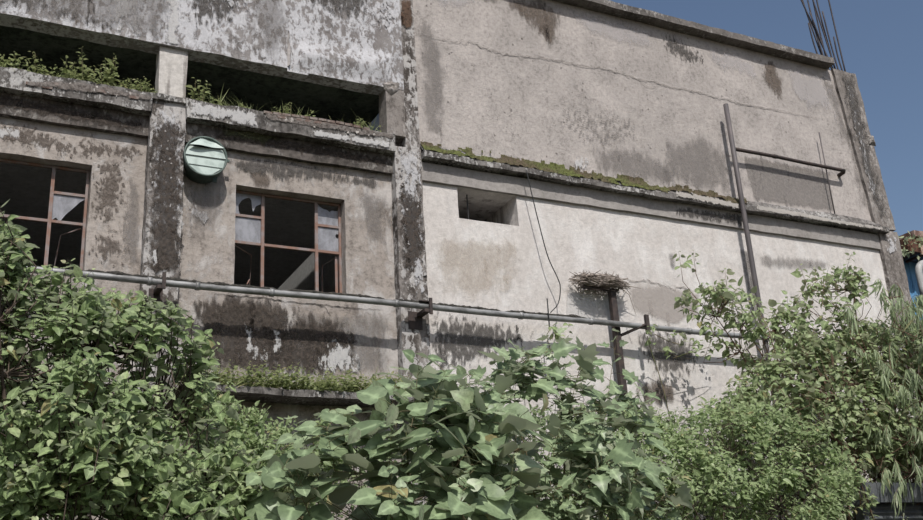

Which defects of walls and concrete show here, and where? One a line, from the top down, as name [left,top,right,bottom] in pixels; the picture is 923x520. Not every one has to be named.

damp [509,0,559,43]
flaking render [25,80,152,100]
damp [663,36,782,98]
peeling [0,123,142,266]
peeling [146,109,212,230]
peeling [397,148,427,293]
damp [676,207,742,226]
damp [791,72,886,217]
damp [194,294,384,379]
damp [432,313,531,369]